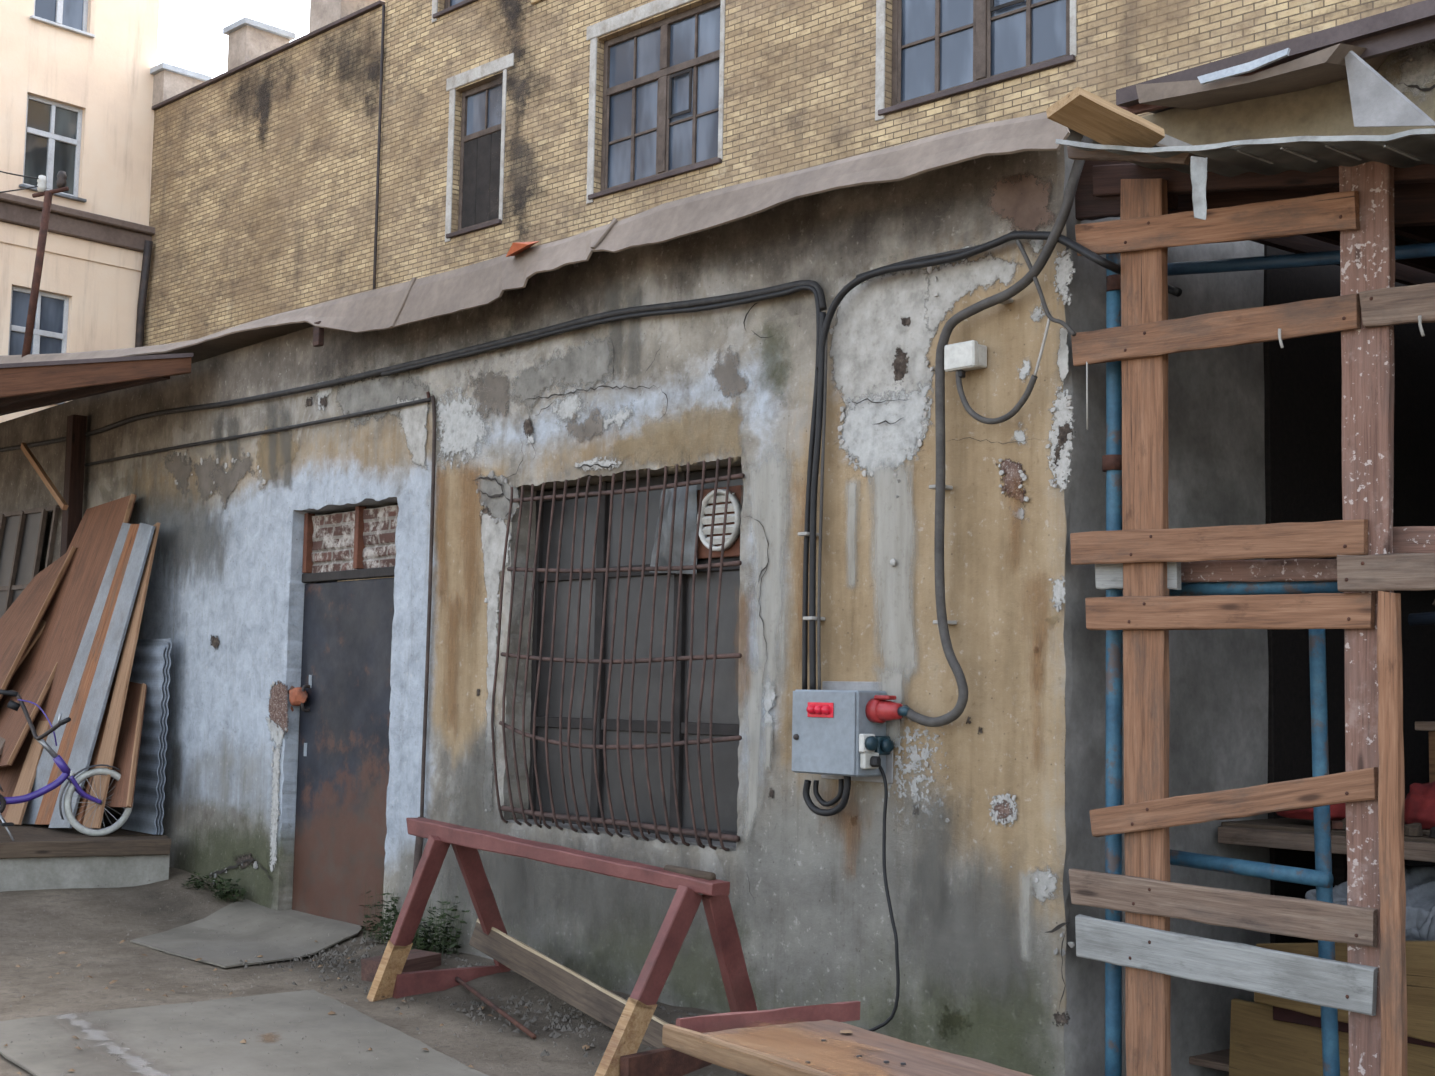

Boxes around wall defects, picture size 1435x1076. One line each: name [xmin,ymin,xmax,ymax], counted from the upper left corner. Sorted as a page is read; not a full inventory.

leakage [259,93,268,141]
spalling [710,346,748,398]
spalling [830,172,1076,520]
spalling [266,680,308,872]
peeling [882,718,950,828]
spalling [989,793,1018,827]